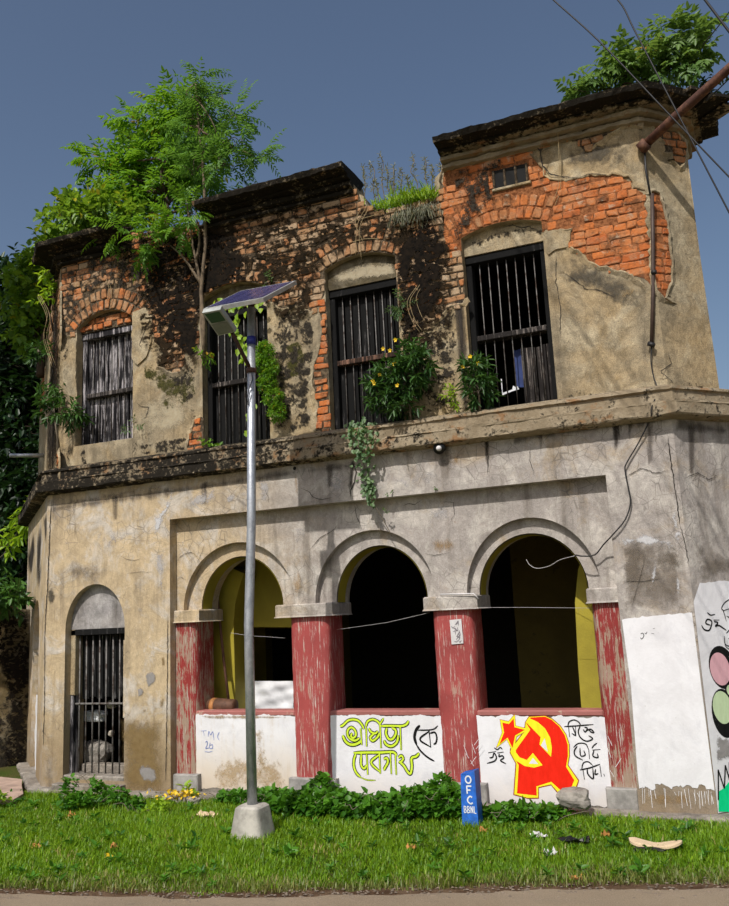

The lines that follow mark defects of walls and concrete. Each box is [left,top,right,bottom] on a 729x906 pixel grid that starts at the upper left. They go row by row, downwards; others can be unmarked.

flaking render [39,146,677,433]
damp [28,520,46,583]
crack [624,439,719,564]